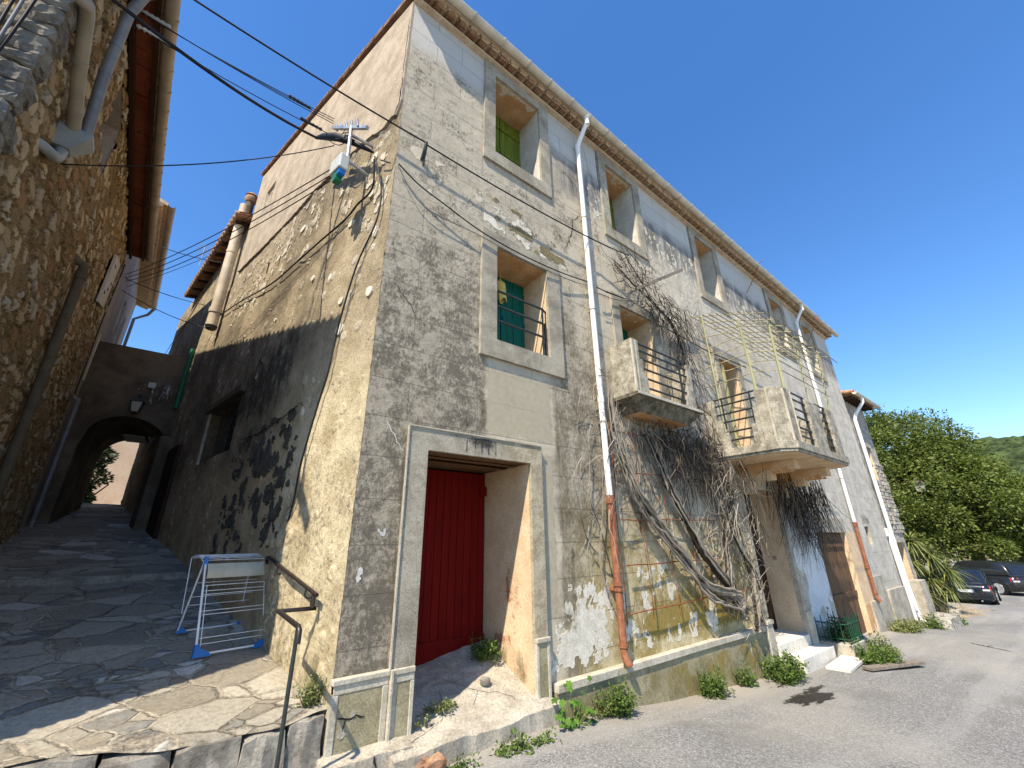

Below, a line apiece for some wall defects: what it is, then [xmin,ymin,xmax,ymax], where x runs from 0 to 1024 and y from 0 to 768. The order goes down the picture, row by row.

peeling [229,188,326,328]
peeling [335,132,391,237]
peeling [457,191,567,270]
leakage [209,404,303,562]
peeling [550,518,730,676]